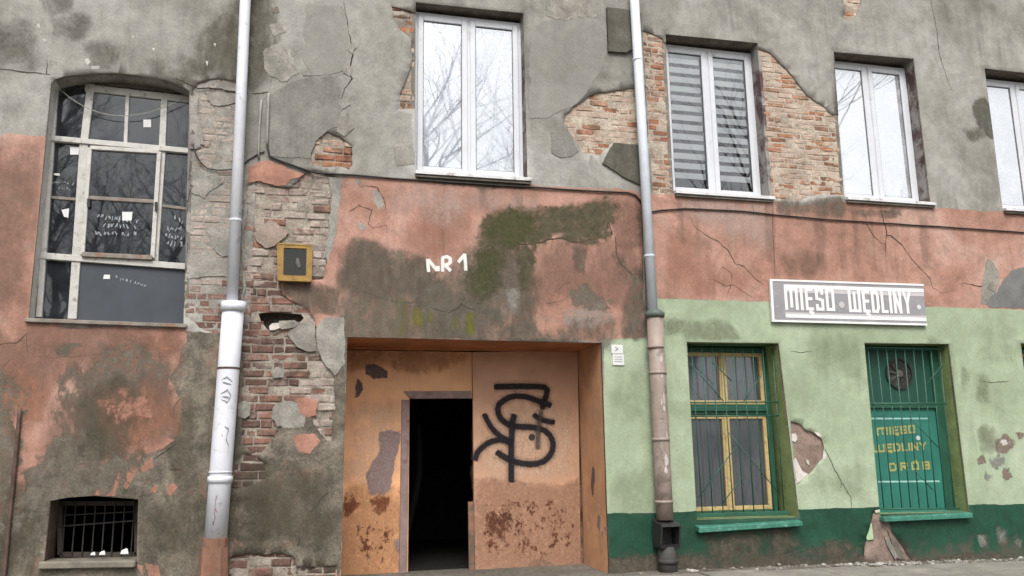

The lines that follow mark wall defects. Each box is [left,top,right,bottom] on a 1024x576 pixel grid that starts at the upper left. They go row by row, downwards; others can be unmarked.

crack [341,2,358,99]
flaking render [564,31,673,195]
flaking render [759,50,843,201]
flaking render [184,79,361,489]
leakage [283,202,641,347]
crack [690,205,775,298]
crack [867,210,994,293]
leakage [0,329,192,480]
flaking render [791,422,827,483]
rust [343,495,399,570]
rust [482,499,574,559]
flaking render [864,510,910,562]